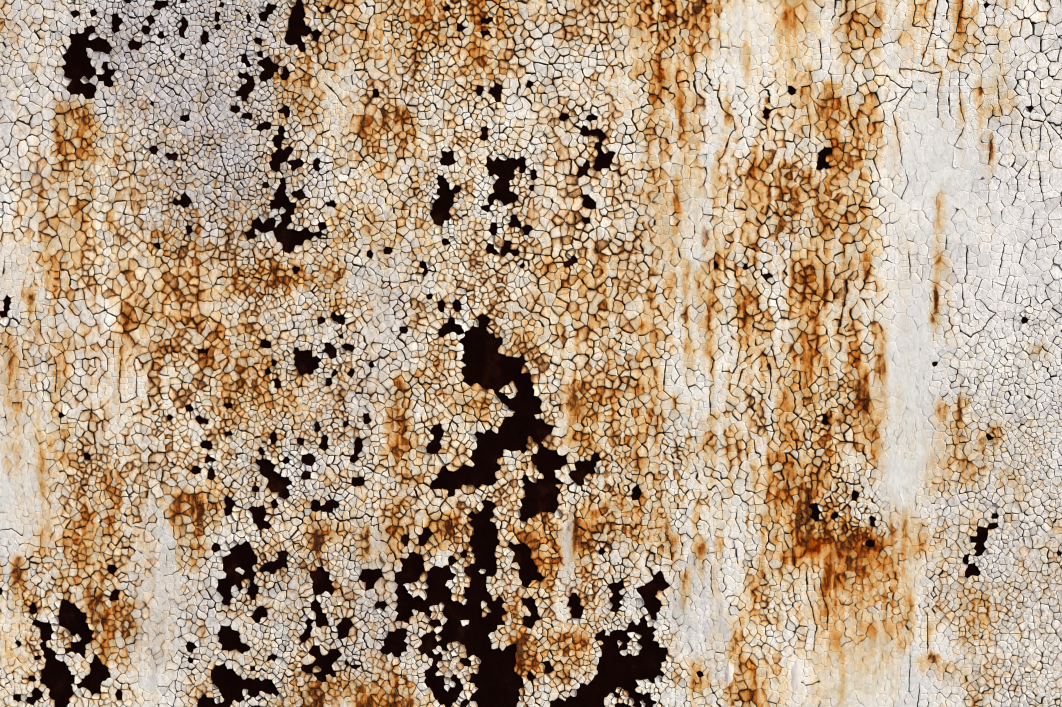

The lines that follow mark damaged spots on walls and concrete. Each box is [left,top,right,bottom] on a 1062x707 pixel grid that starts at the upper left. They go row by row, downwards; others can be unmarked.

peeling [225,0,336,280]
corrosion [637,0,709,97]
crack [899,0,1062,169]
crack [986,153,1062,209]
corrosion [790,249,830,385]
corrosion [170,492,220,559]
peeling [178,401,374,707]
peeling [355,293,607,707]
corrosion [757,453,883,609]
crack [908,219,1062,707]
peeling [550,571,674,707]
crack [643,612,777,707]